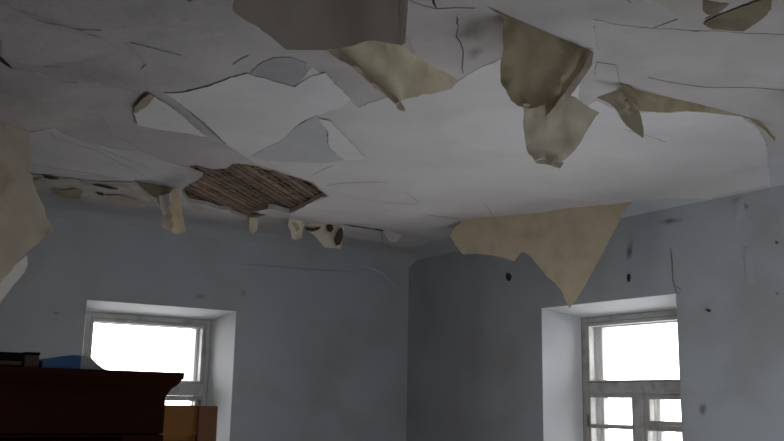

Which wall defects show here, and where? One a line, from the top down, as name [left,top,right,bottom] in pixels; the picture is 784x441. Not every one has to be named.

crack [409,0,475,74]
crack [0,56,145,97]
crack [164,55,249,144]
crack [78,179,118,196]
peeling [29,58,771,247]